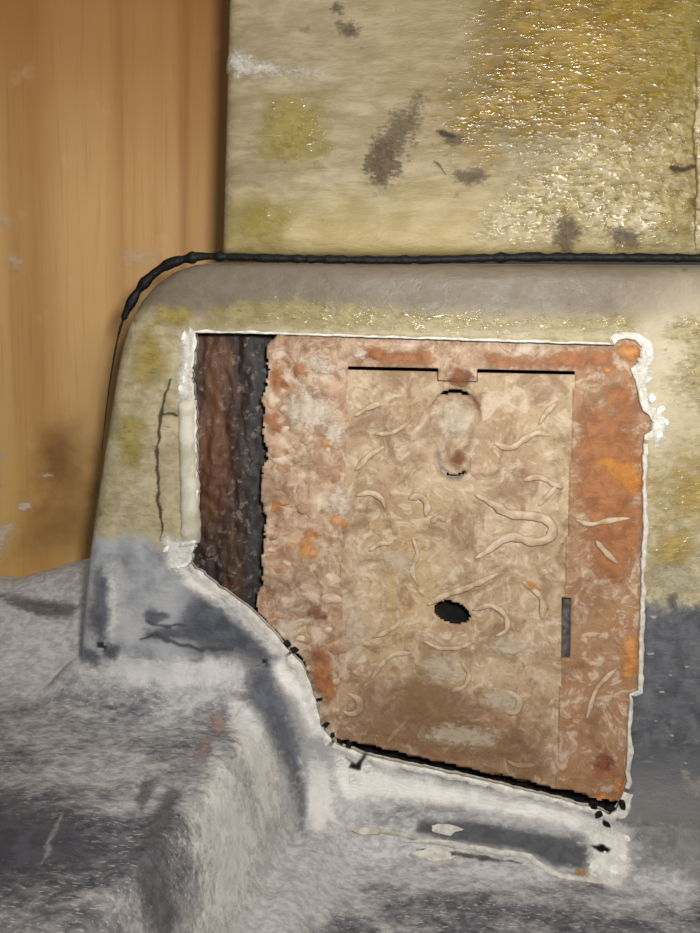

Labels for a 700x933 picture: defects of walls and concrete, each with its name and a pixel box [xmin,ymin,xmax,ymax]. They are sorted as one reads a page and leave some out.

damp [445,0,700,156]
damp [363,94,422,184]
crack [670,58,700,244]
damp [456,169,485,184]
damp [553,217,580,253]
damp [609,226,639,250]
rust [359,345,433,364]
rust [451,369,472,387]
rust [486,344,640,372]
rust [573,387,640,583]
rust [312,650,335,703]
rust [621,634,638,678]